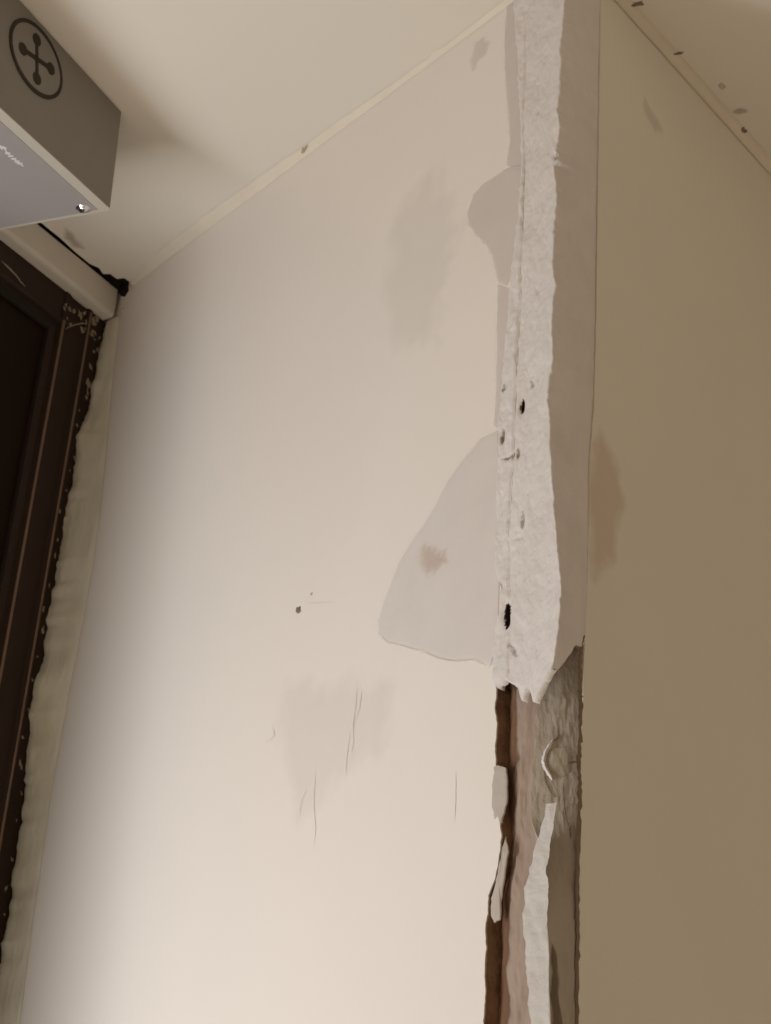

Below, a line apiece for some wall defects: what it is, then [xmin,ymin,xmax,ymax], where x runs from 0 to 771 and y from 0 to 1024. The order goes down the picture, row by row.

spalling [485,645,584,1024]